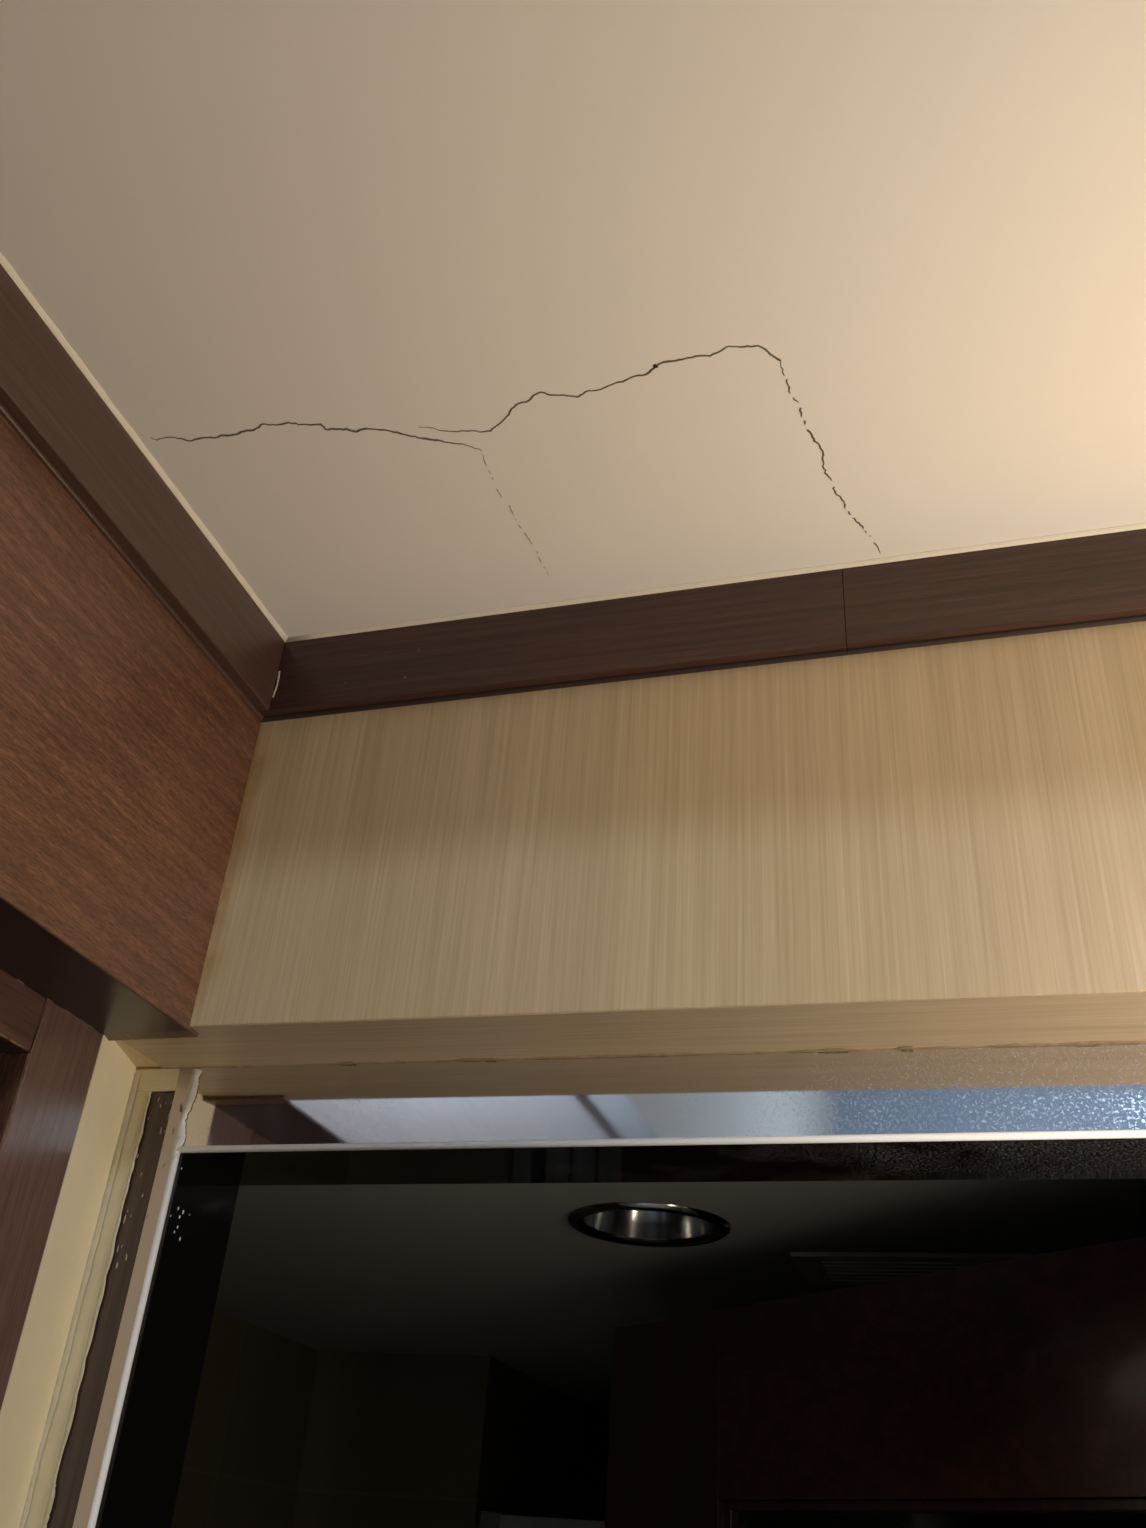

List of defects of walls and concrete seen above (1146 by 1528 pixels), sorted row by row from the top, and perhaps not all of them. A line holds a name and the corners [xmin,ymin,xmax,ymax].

crack [140,345,880,574]